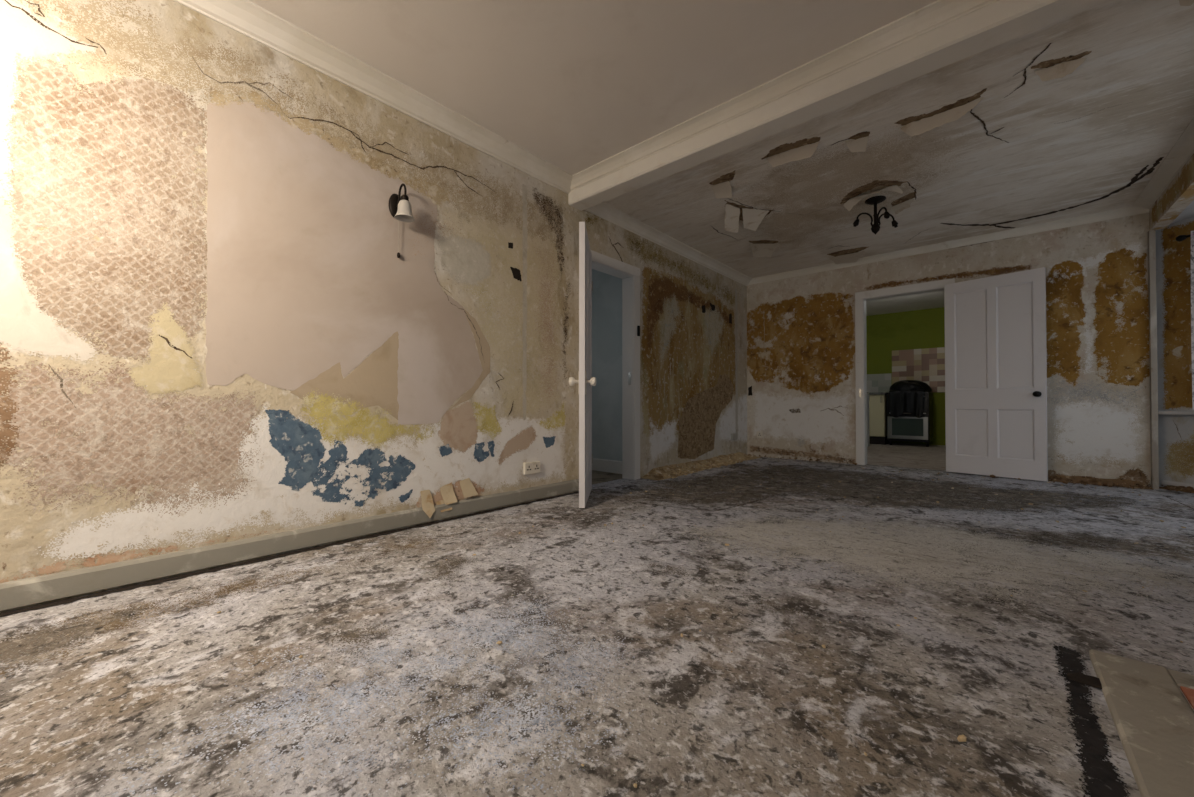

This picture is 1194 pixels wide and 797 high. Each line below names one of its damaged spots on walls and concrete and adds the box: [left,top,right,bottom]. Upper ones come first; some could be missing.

crack [5,0,106,54]
peeling [1004,43,1092,98]
crack [192,56,495,196]
peeling [762,131,870,167]
peeling [894,88,1010,143]
peeling [840,180,916,214]
crack [905,157,1164,249]
peeling [827,246,868,264]
flaking render [1046,242,1142,374]
flaking render [0,400,566,583]